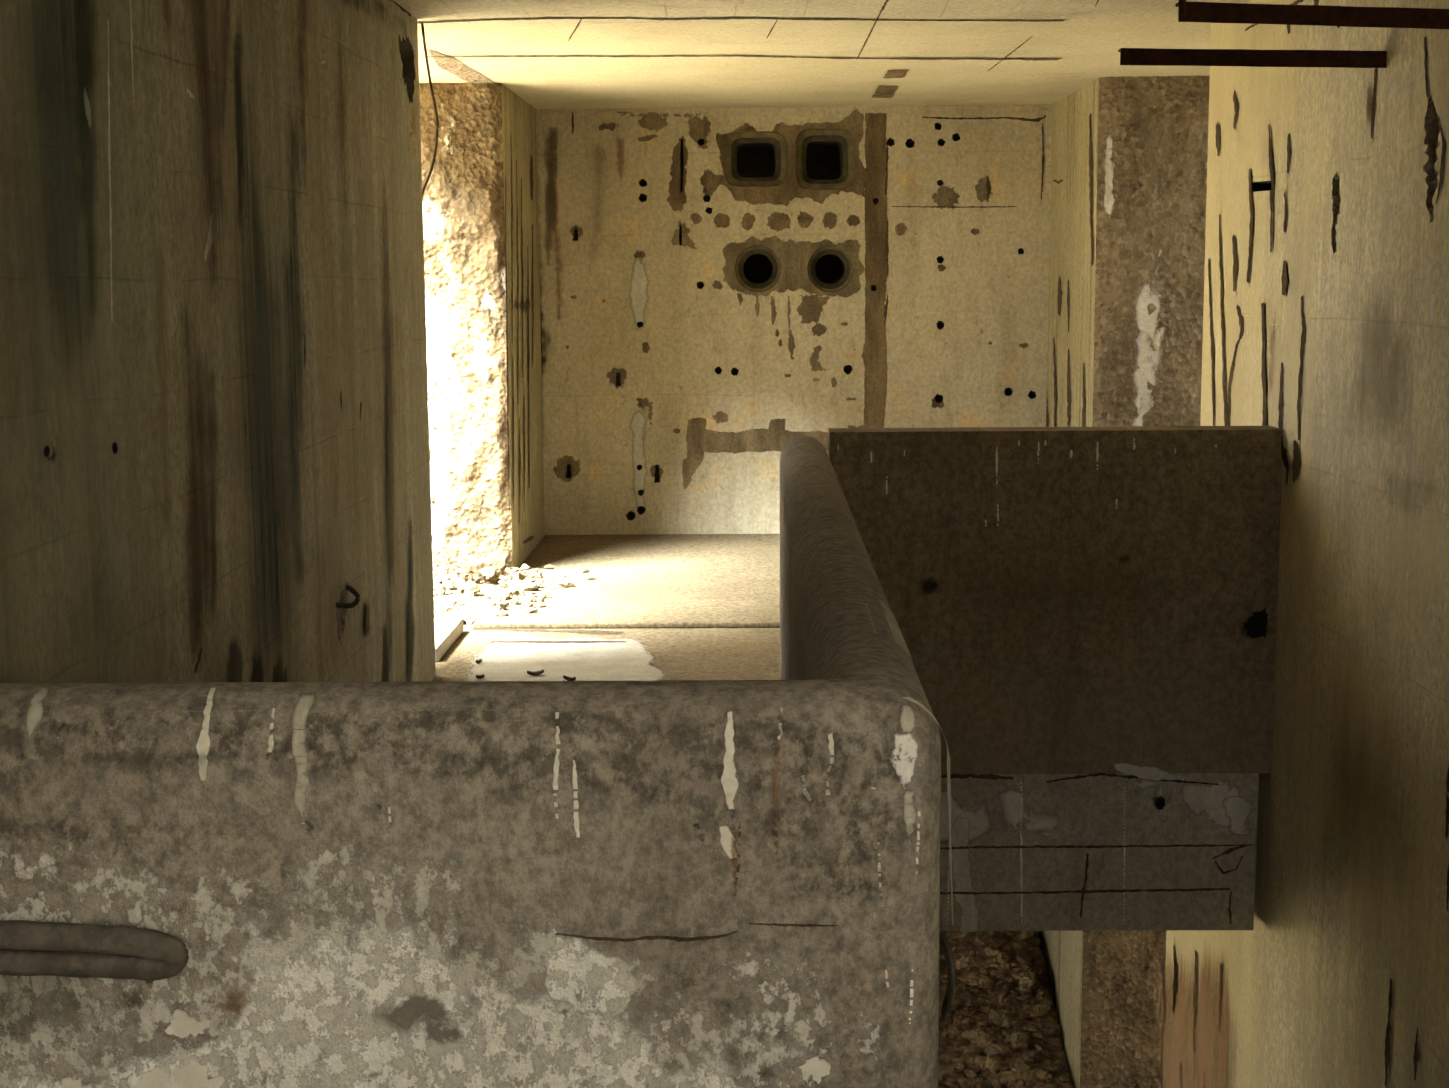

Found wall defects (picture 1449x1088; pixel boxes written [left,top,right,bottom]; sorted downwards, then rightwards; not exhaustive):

water stain [40,0,113,334]
water stain [185,312,216,648]
water stain [196,33,302,781]
water stain [367,185,414,682]
spalling [398,33,534,584]
flaking render [650,464,664,483]
peeling [673,411,828,490]
peeling [599,69,910,428]
spalling [1423,93,1446,223]
peeling [0,842,880,1088]
crack [555,923,838,942]
crack [1441,767,1449,911]